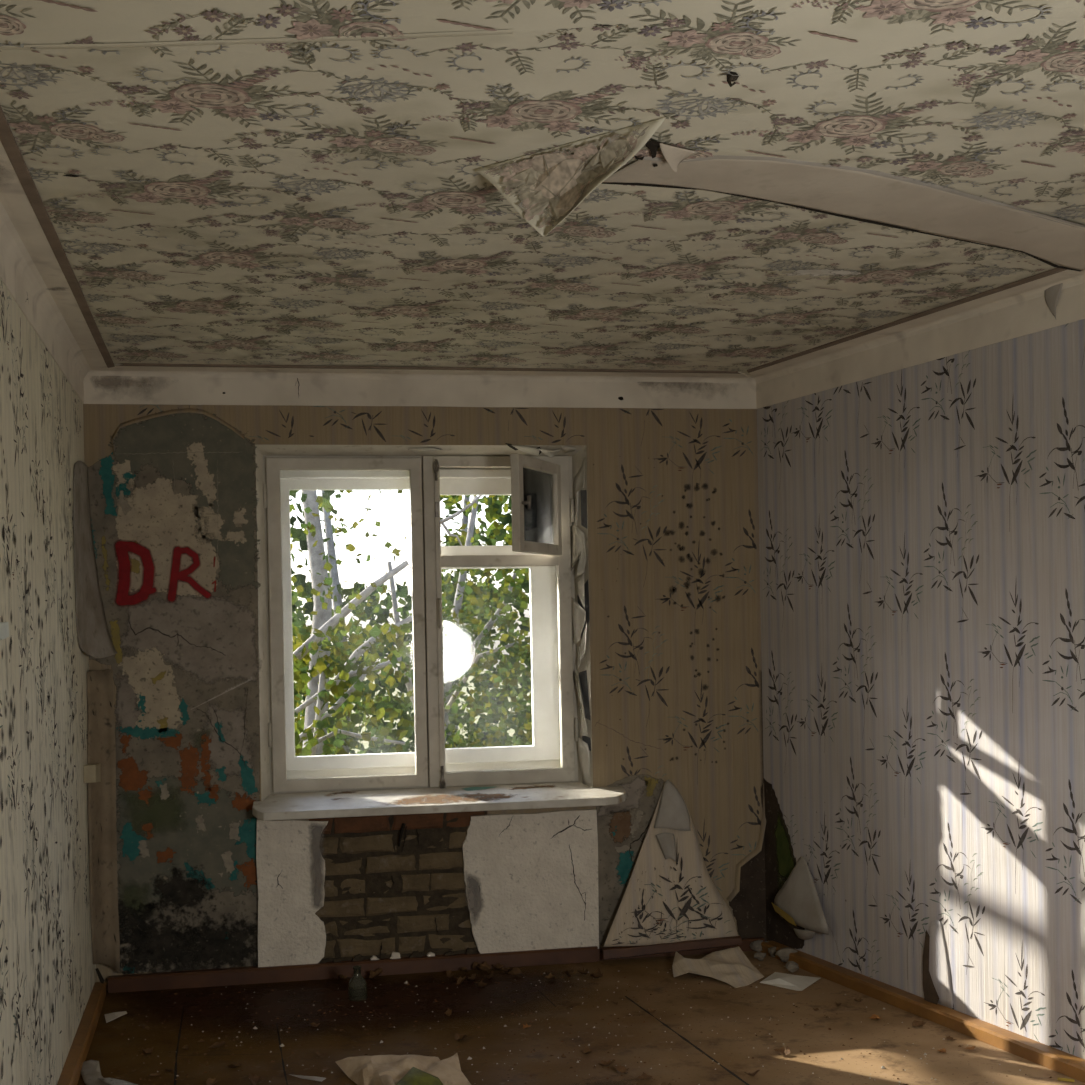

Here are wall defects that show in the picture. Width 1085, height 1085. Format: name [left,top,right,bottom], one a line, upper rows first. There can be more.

crack [128,614,224,655]
peeling [73,408,691,973]
mould [114,867,258,975]